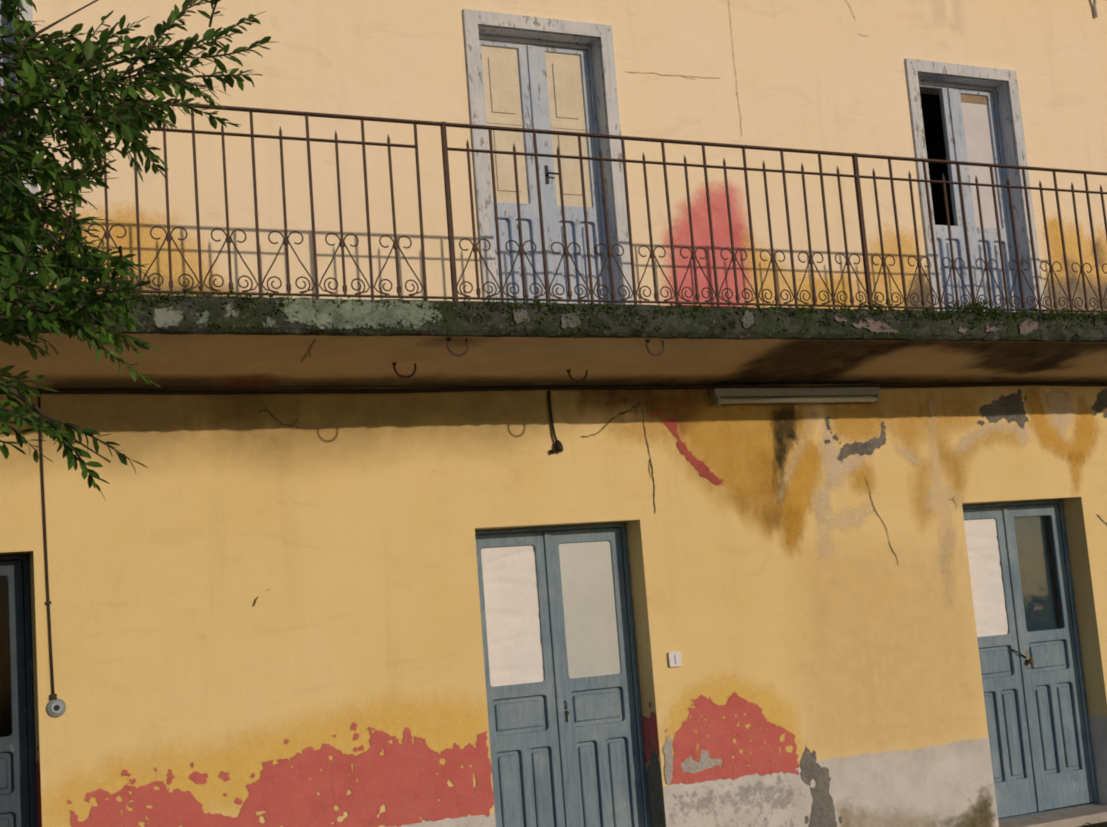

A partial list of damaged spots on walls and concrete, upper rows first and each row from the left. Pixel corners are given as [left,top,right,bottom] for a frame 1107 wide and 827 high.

crack [581,402,656,511]
peeling [651,412,724,485]
water stain [419,341,1107,569]
flaking render [825,415,887,462]
flaking render [977,388,1029,429]
flaking render [1092,388,1107,418]
crack [866,480,899,566]
peeling [68,722,494,827]
peeling [642,692,842,827]